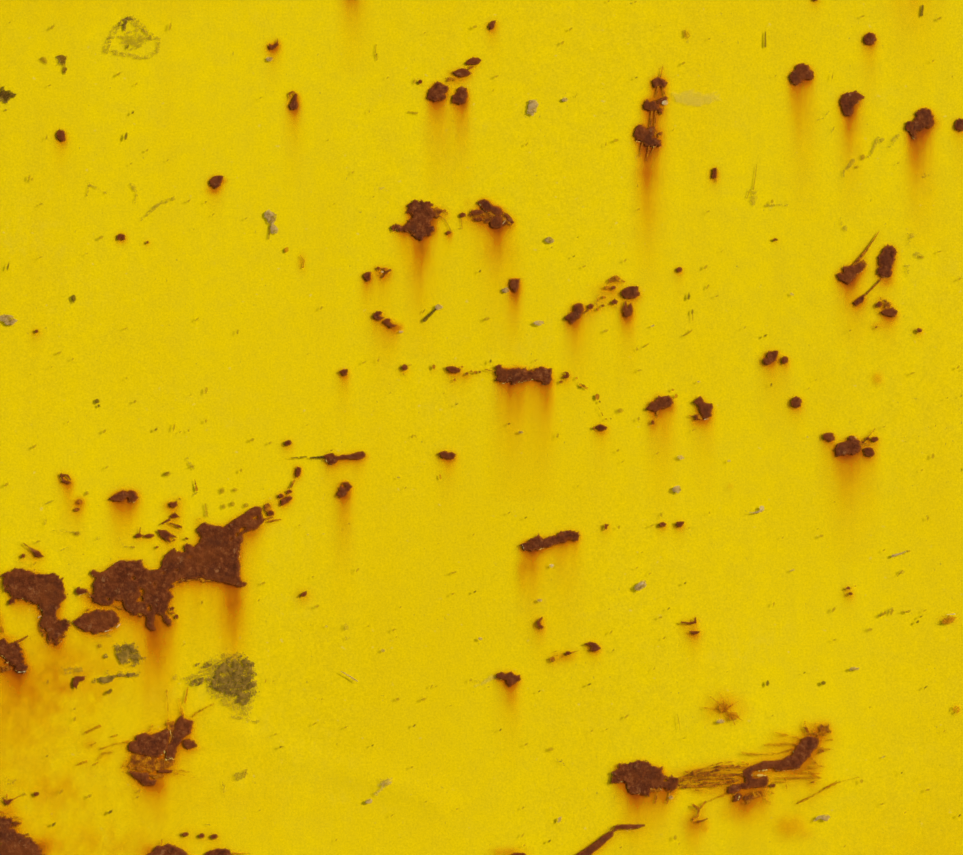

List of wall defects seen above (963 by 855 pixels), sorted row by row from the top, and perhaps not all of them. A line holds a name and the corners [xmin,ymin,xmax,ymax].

rust [414,57,481,116]
rust [634,66,668,192]
rust [906,108,935,165]
rust [392,199,514,271]
rust [837,232,898,328]
rust [432,365,569,406]
rust [823,429,878,474]
rust [1,451,366,668]
rust [521,530,580,569]
rust [126,689,203,795]
rust [611,724,832,815]
rust [0,792,49,855]